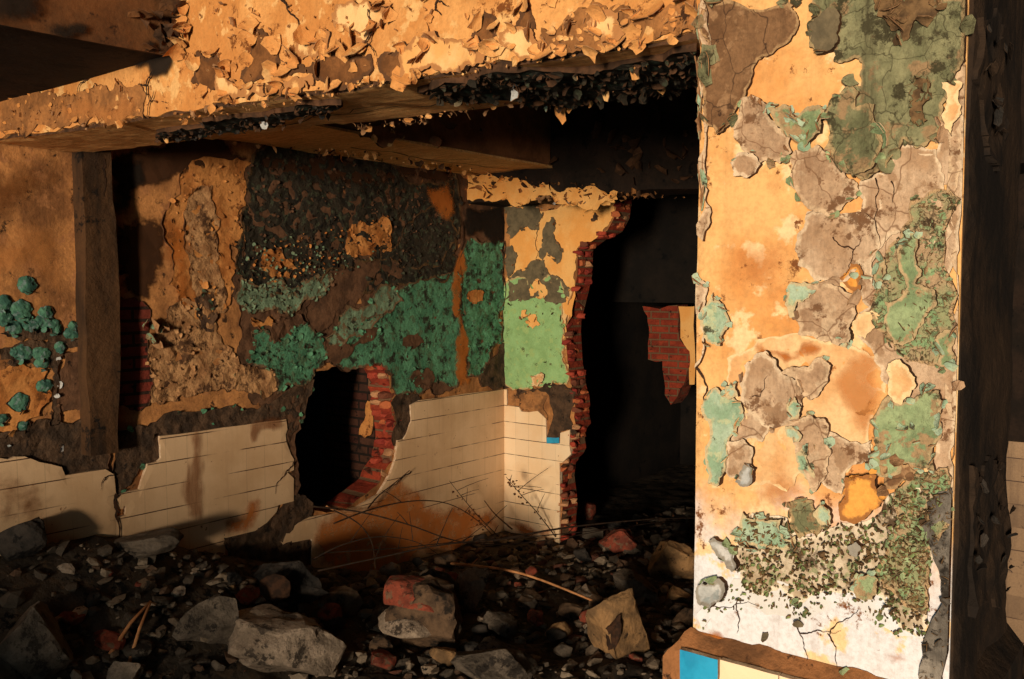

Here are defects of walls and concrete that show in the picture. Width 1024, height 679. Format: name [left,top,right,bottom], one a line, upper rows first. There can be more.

peeling [127,0,192,61]
spalling [0,78,167,138]
peeling [0,113,663,566]
peeling [692,273,733,368]
crack [101,474,121,537]
corrosion [316,483,492,572]
crack [796,611,858,665]